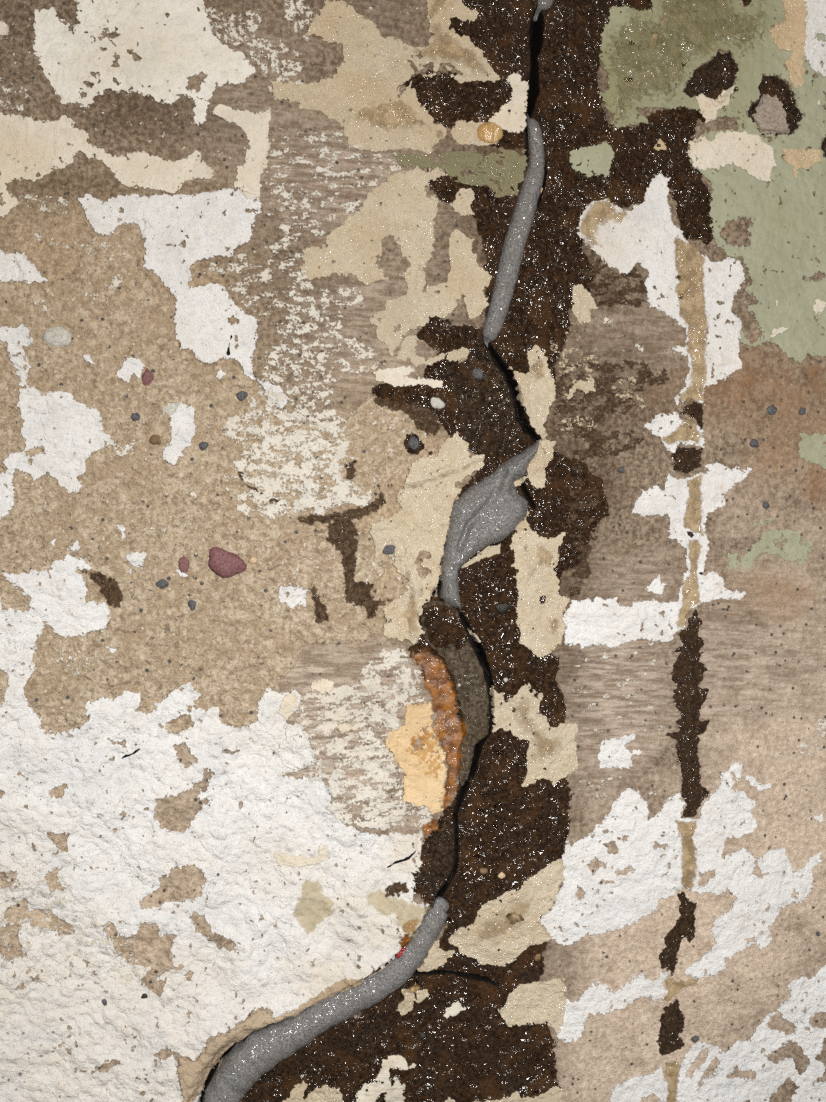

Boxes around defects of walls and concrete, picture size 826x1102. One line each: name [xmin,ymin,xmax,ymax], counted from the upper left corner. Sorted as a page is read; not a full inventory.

crack [526,5,547,207]
peeling [569,0,826,453]
crack [483,339,541,442]
peeling [0,0,599,1102]
crack [520,481,536,509]
rust [422,819,439,839]
crack [365,563,500,986]
rust [402,648,466,806]
peeling [417,683,826,981]
crack [199,1032,252,1102]
peeling [498,971,670,1043]
peeling [609,965,826,1102]